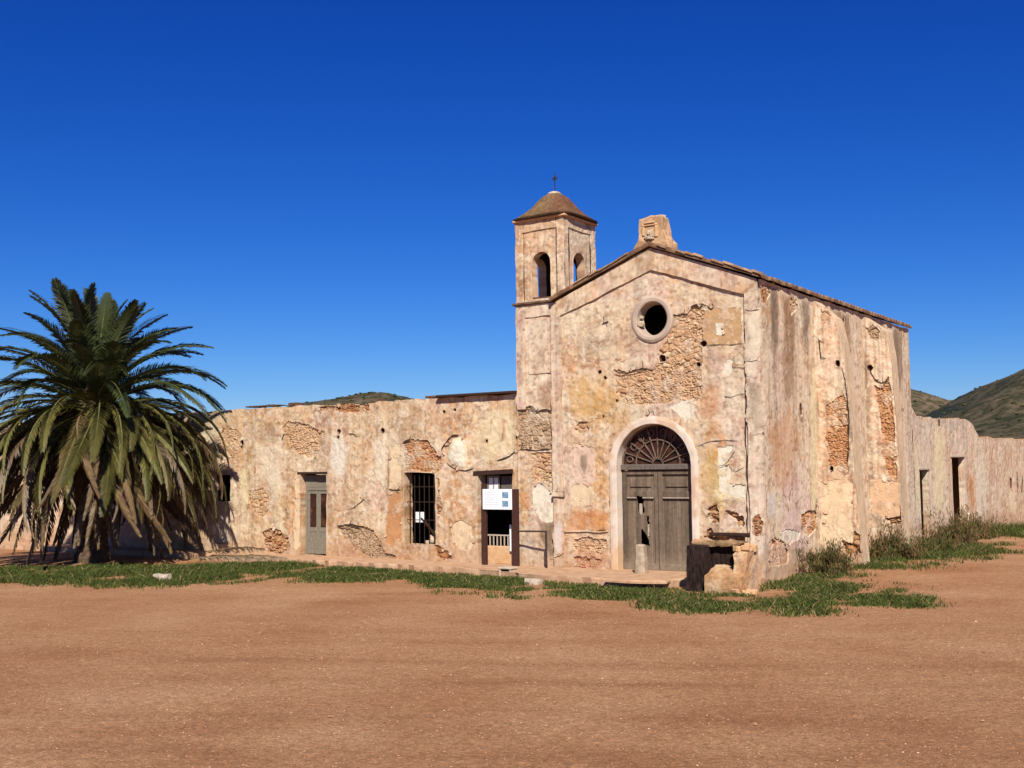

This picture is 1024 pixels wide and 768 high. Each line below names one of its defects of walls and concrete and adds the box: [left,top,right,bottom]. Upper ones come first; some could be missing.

flaking render [597,303,742,421]
flaking render [218,425,244,464]
flaking render [248,488,269,516]
flaking render [263,476,301,554]
flaking render [283,422,341,459]
flaking render [337,427,476,560]
flaking render [516,405,553,522]
flaking render [574,537,607,569]
crack [699,307,759,542]
flaking render [704,394,864,566]
flaking render [869,382,903,526]